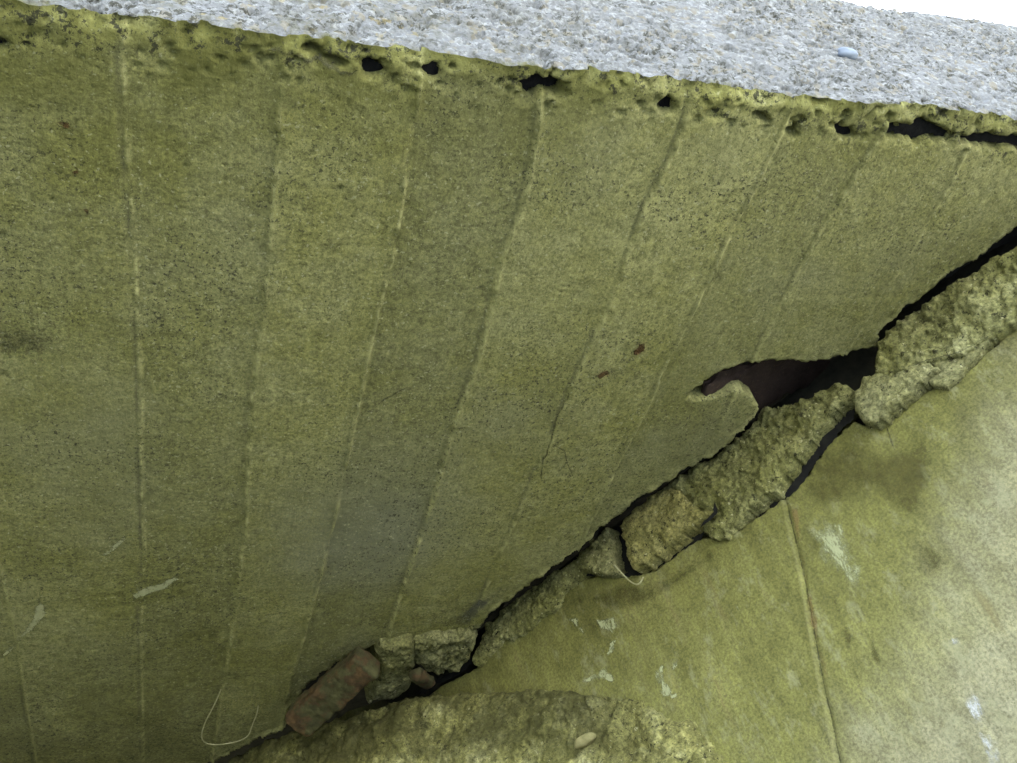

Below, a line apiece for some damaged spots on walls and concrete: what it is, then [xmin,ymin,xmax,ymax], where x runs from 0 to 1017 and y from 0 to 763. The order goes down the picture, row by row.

crack [936,227,1017,285]
crack [540,395,574,484]
crack [523,458,718,589]
crack [756,405,856,761]
water stain [815,525,858,582]
crack [420,656,473,694]
spalling [229,689,727,763]